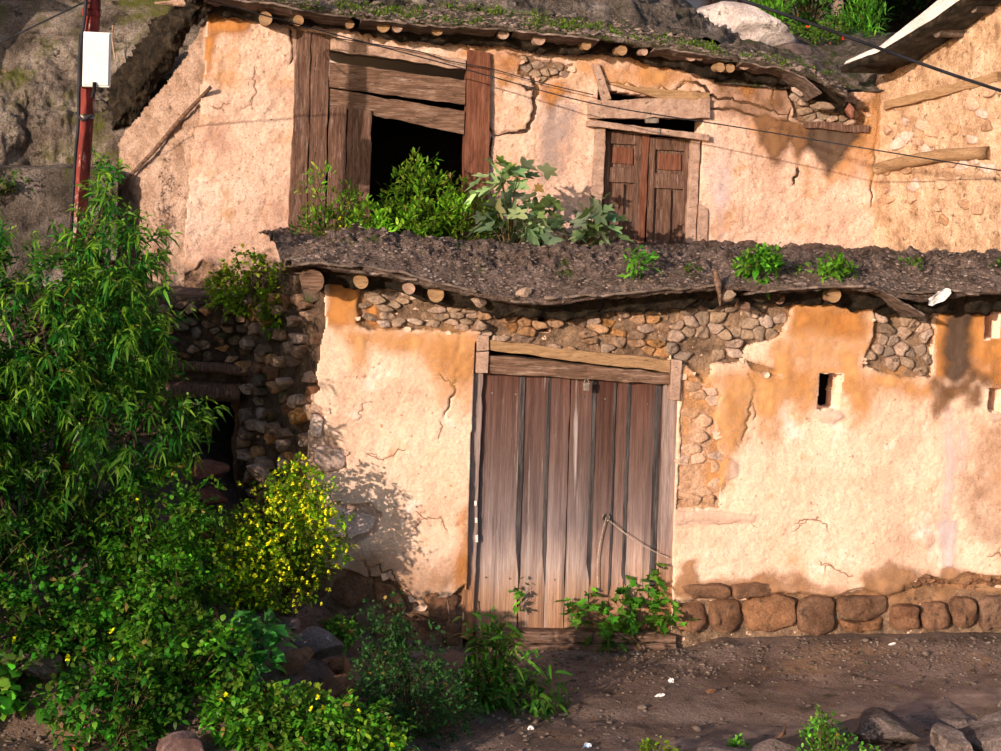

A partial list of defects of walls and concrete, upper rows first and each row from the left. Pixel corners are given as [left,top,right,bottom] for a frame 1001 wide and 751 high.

crack [489,76,539,158]
spalling [512,54,576,84]
damp [719,84,881,175]
spalling [786,88,871,125]
crack [438,374,457,439]
spalling [355,288,793,511]
damp [750,304,996,420]
spalling [863,310,935,378]
spalling [304,399,466,649]
crack [792,516,831,536]